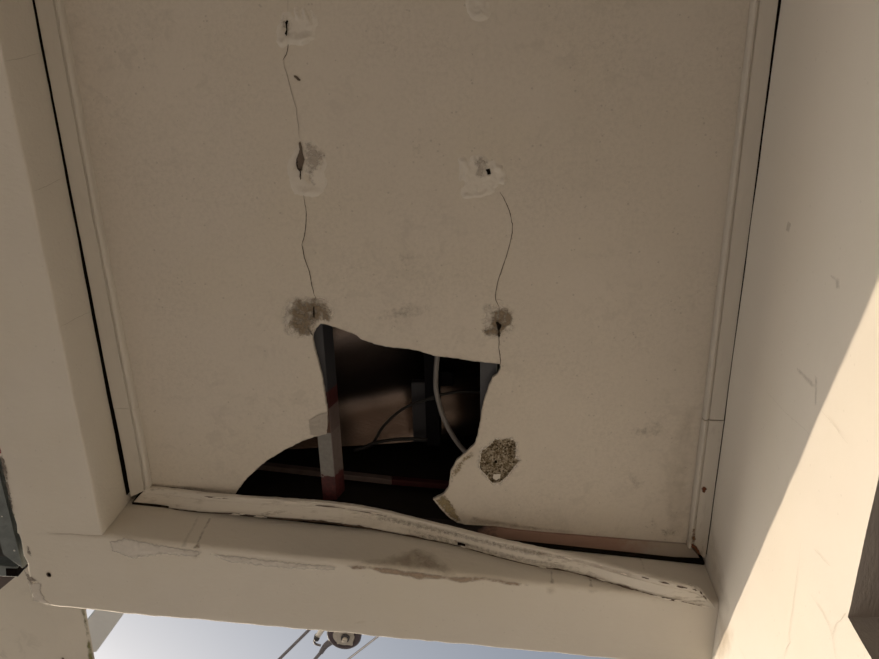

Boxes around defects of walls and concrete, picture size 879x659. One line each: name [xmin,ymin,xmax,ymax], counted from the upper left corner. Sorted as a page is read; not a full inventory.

crack [297,195,316,301]
crack [489,192,513,364]
spalling [205,298,520,537]
peeling [154,506,709,608]